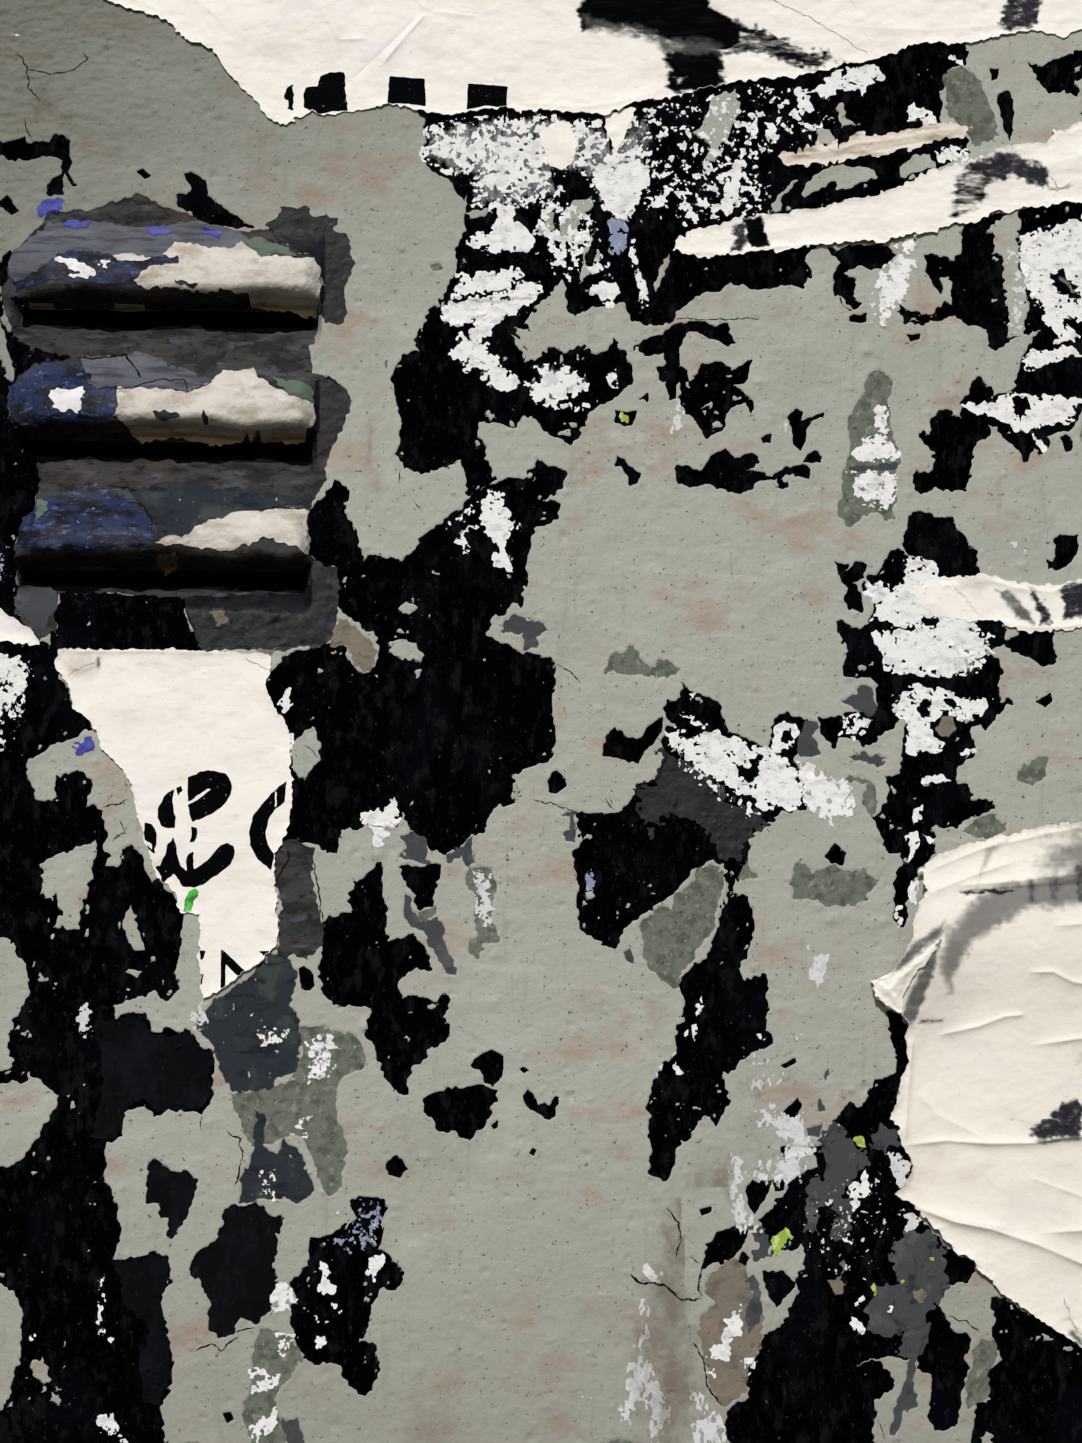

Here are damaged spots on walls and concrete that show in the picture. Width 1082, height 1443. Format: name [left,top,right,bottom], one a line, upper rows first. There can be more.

peeling [0,133,77,196]
peeling [997,91,1015,141]
peeling [1028,50,1082,115]
peeling [49,386,85,414]
peeling [633,321,754,439]
peeling [827,201,1082,494]
peeling [562,370,1057,1181]
peeling [423,1050,504,1140]
peeling [146,1158,198,1239]
peeling [189,1026,366,1338]
peeling [698,1011,1082,1443]
peeling [242,1196,404,1443]